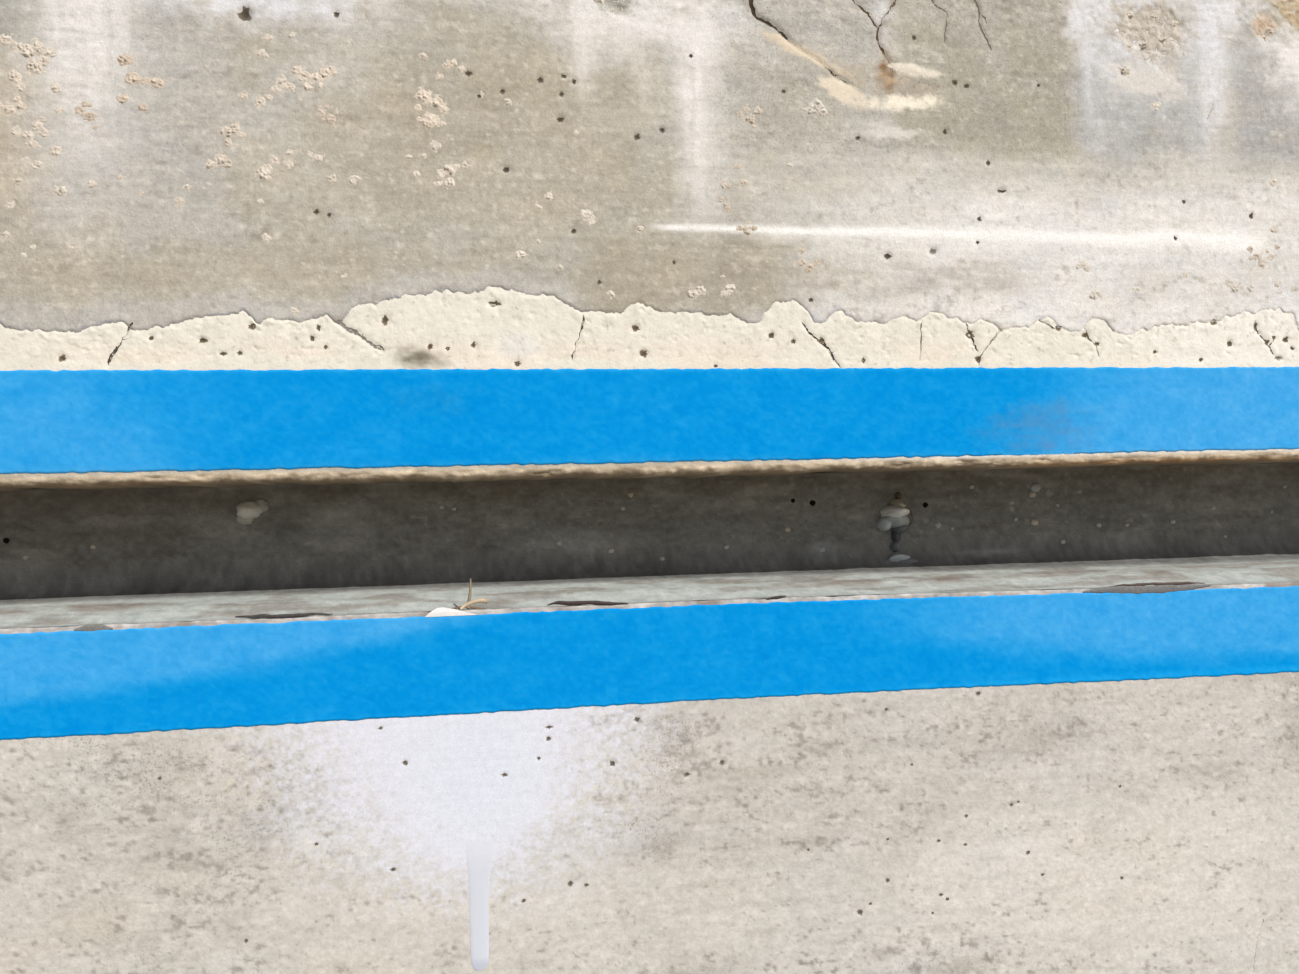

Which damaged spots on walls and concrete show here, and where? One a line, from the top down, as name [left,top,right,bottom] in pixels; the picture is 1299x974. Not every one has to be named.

crack [749,0,848,84]
rust [800,44,912,96]
crack [853,0,901,70]
crack [932,0,992,50]
leakage [0,0,407,230]
spalling [0,286,1299,371]